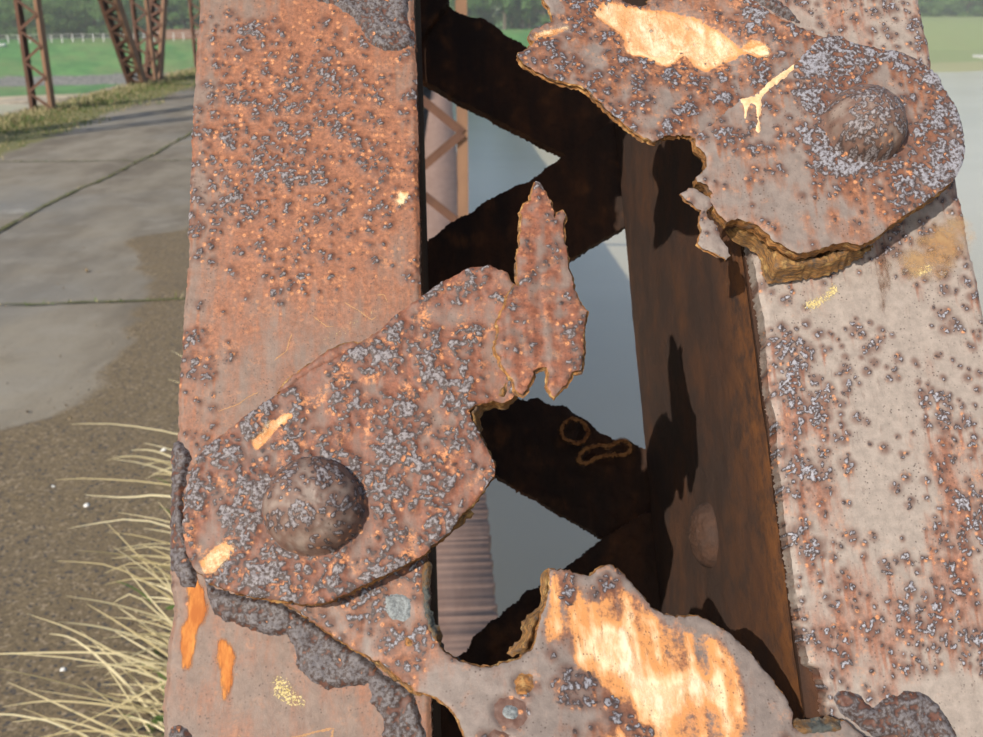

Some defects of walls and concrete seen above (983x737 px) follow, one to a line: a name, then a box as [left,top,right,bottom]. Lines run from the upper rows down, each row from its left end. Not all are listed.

corrosion [317,0,415,51]
peeling [605,5,729,60]
peeling [743,41,769,57]
corrosion [755,0,800,23]
corrosion [679,188,873,284]
corrosion [277,341,358,394]
peeling [203,547,230,572]
corrosion [168,441,426,737]
spalling [385,594,411,621]
peeling [600,628,716,715]
hole [487,673,534,737]
corrosion [792,691,957,737]